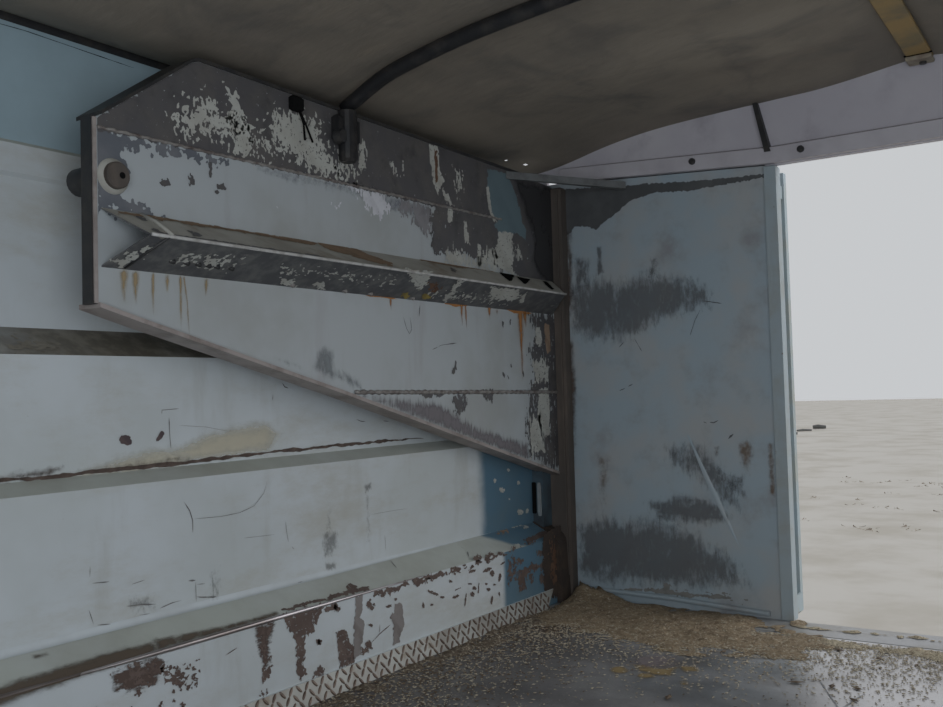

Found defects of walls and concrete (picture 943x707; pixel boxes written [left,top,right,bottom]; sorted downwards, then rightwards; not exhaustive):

peeling [97,62,551,280]
peeling [279,263,527,305]
rust [508,310,531,363]
peeling [379,312,559,470]
peeling [119,435,132,446]
rust [542,525,561,598]
peeling [0,508,548,707]